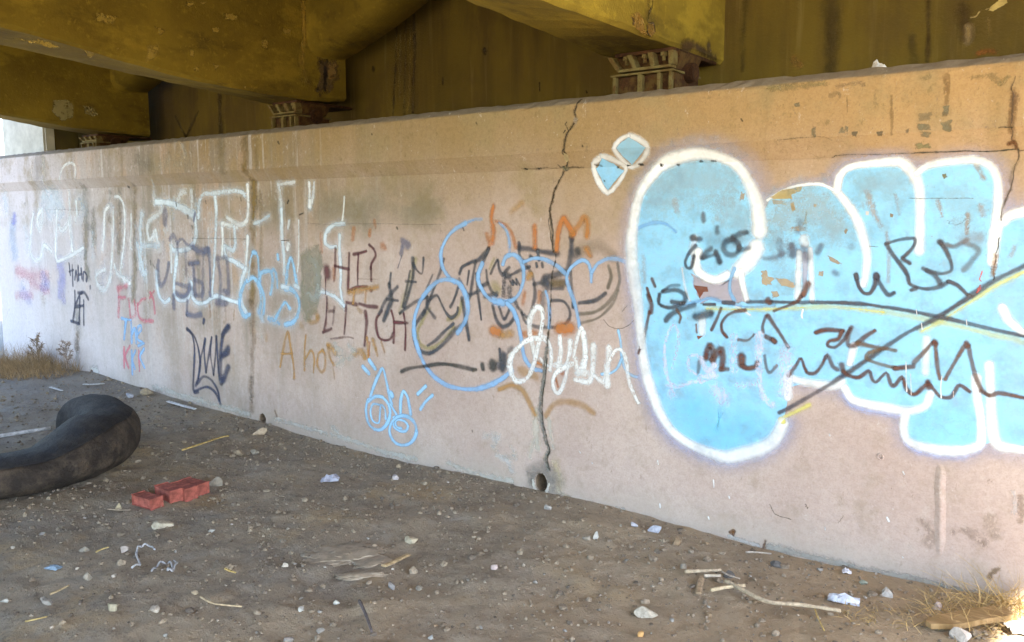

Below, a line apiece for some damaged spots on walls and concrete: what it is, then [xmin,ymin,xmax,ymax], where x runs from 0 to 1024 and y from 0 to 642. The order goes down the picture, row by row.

crack [524,101,714,473]
crack [832,76,1023,280]